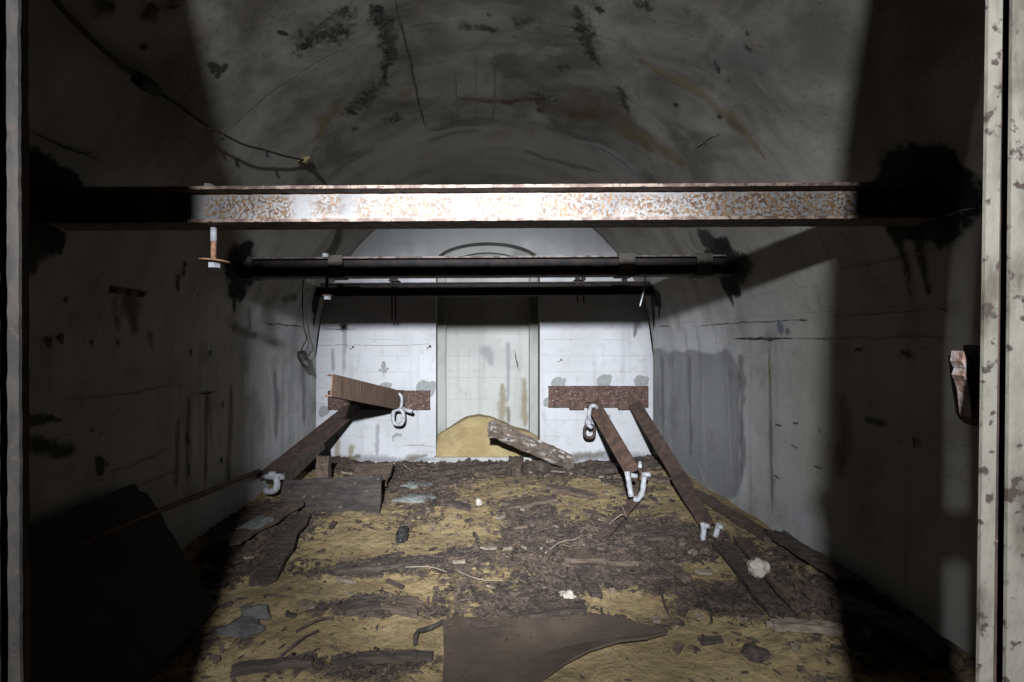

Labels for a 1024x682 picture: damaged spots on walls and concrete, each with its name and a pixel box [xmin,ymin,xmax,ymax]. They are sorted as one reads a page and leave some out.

crack [395,0,496,129]